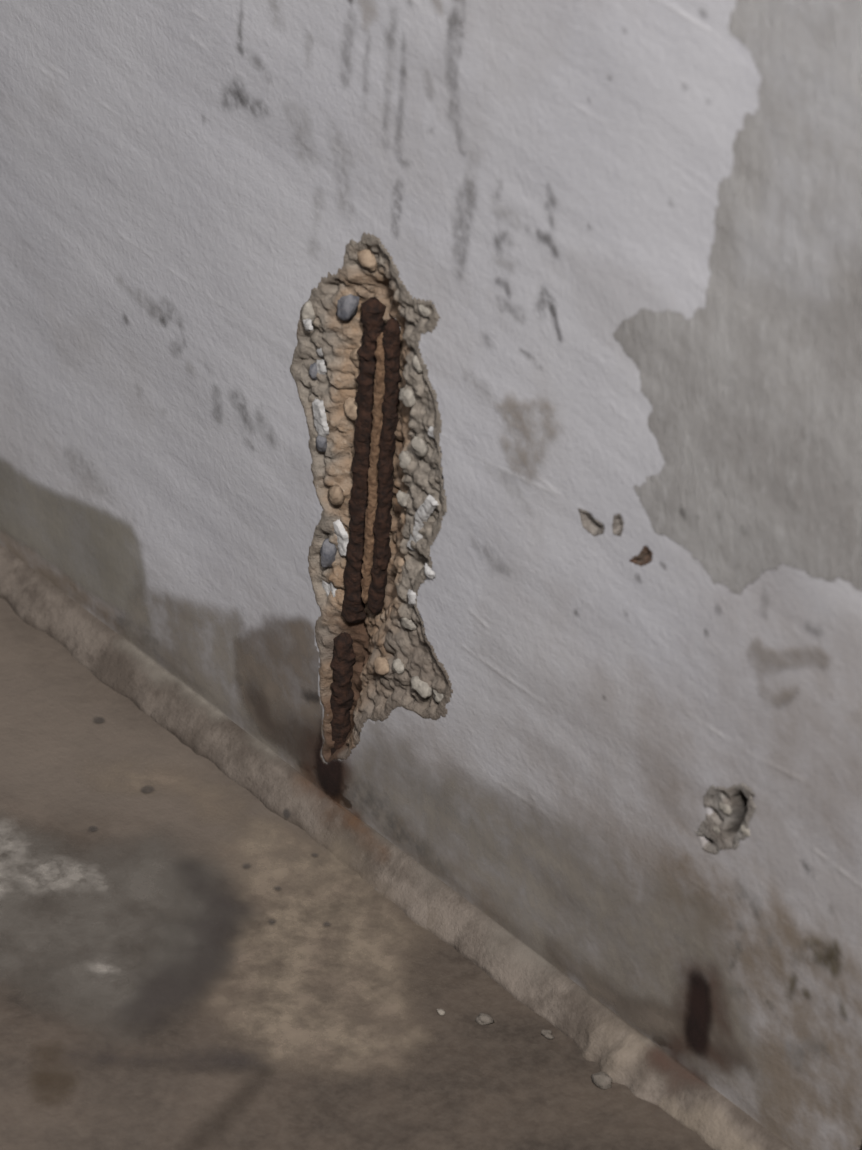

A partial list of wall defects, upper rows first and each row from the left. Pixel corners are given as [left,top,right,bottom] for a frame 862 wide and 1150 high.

spalling [290,232,453,762]
peeling [613,0,862,595]
spalling [695,782,757,855]